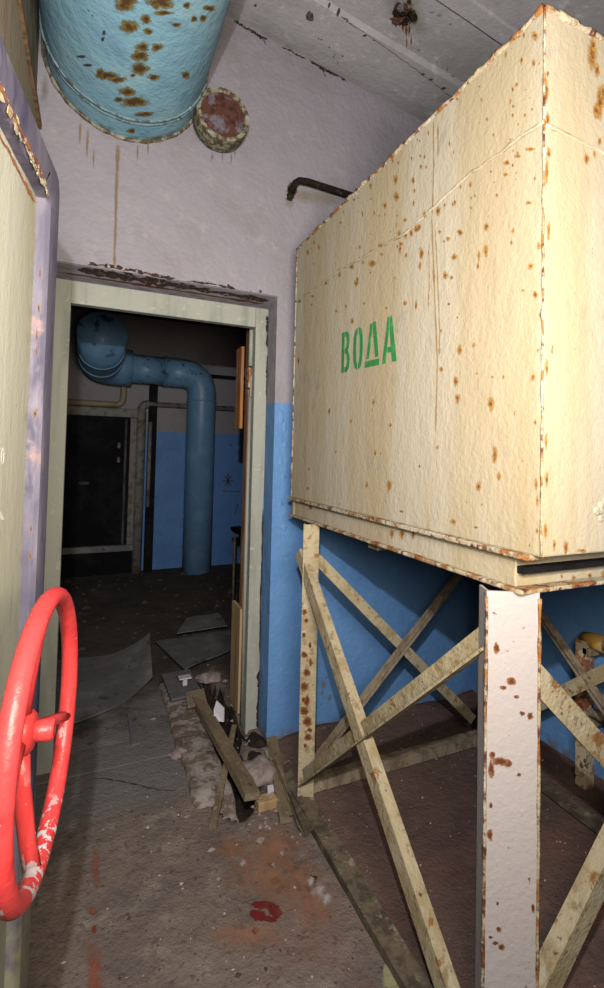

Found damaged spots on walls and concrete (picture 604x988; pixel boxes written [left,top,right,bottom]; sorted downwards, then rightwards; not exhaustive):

peeling [62,262,268,304]